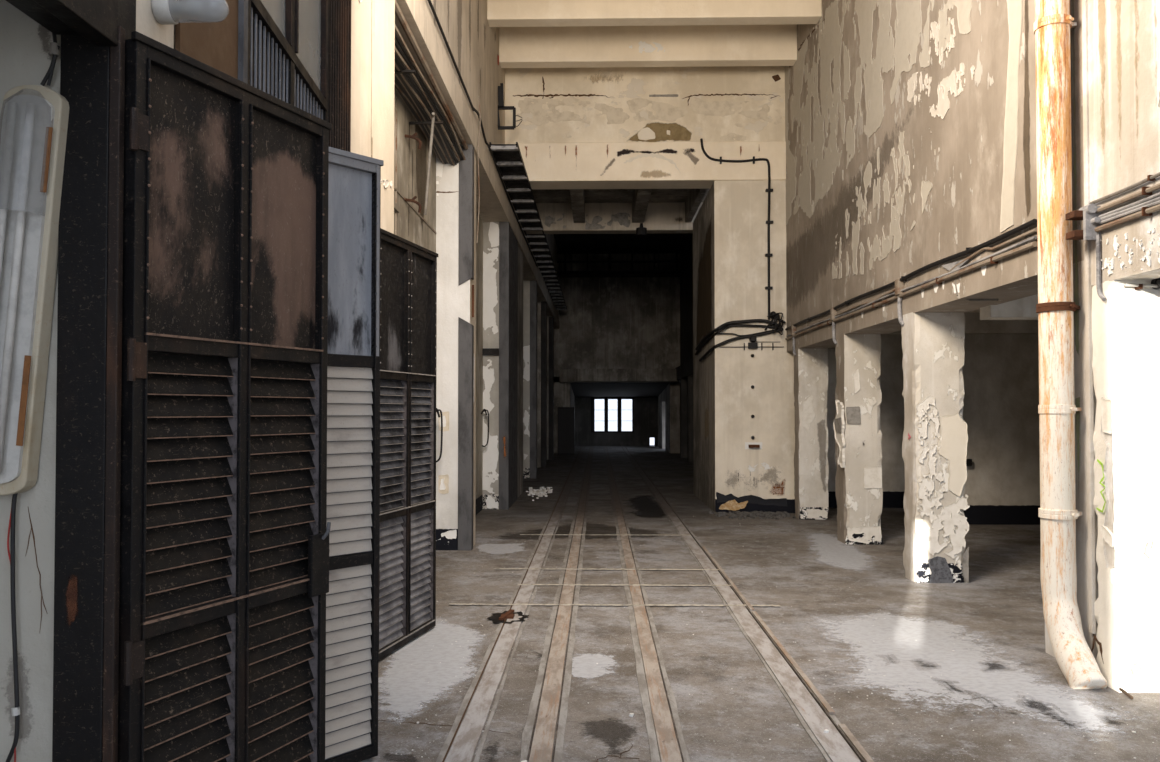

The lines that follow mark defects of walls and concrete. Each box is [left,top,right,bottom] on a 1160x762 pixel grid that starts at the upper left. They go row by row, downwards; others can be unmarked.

peeling [627,98,688,141]
peeling [772,0,975,279]
peeling [1000,0,1023,232]
peeling [483,359,499,509]
peeling [916,396,970,583]
rust [66,576,78,625]